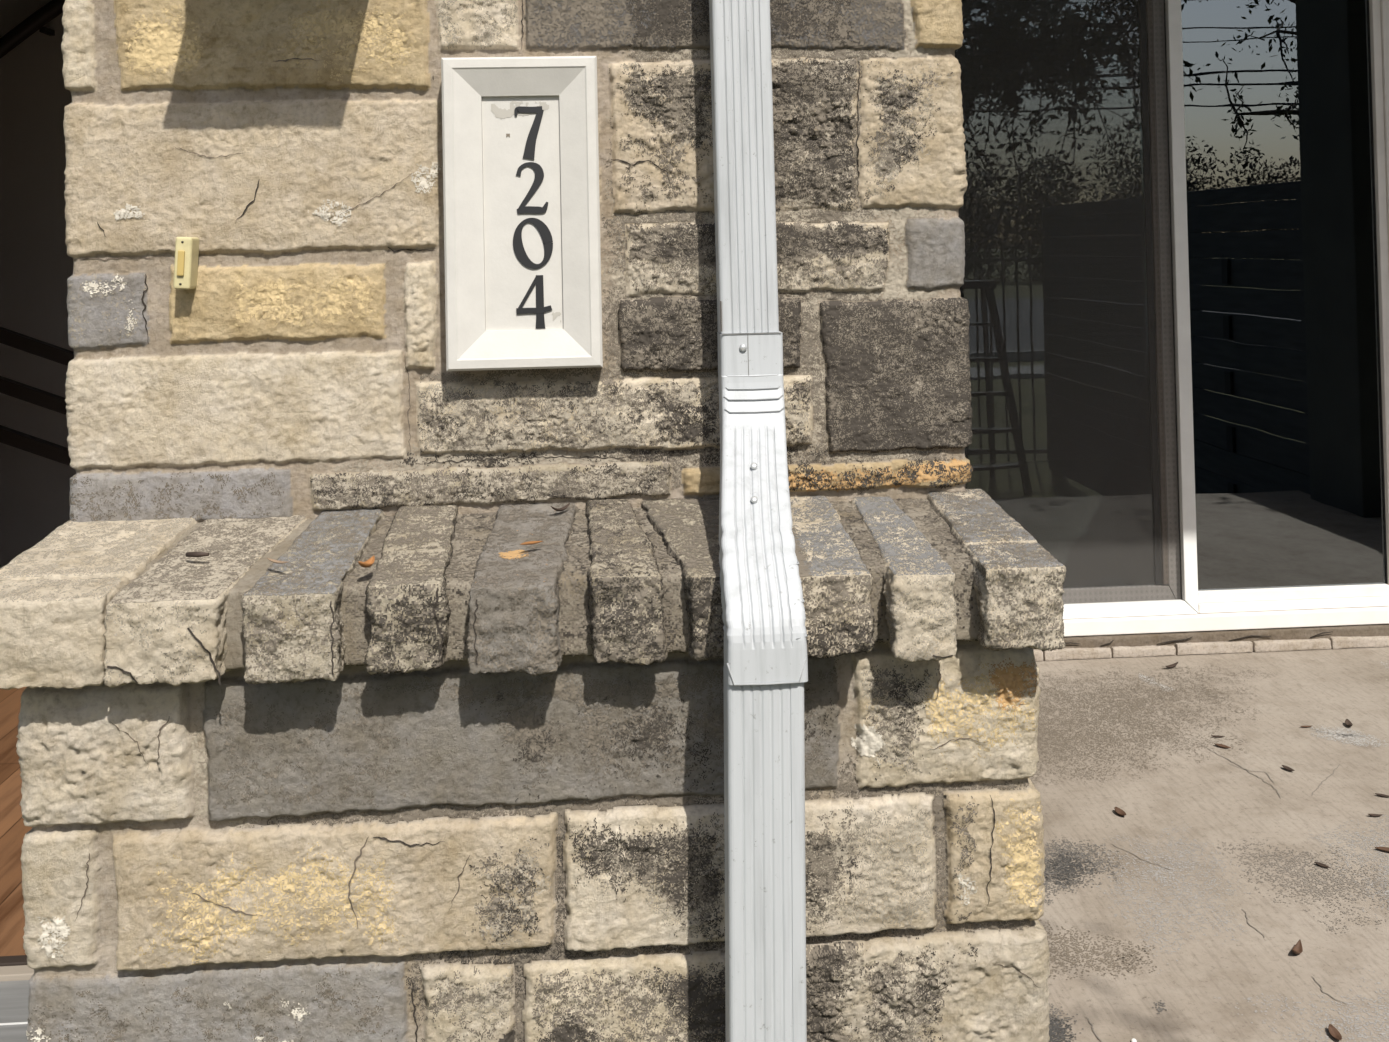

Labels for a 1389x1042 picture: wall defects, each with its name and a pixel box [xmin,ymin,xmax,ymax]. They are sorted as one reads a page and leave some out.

crack [348,837,470,928]
leakage [111,0,726,1042]
leakage [770,0,1157,1042]
crack [987,796,995,906]